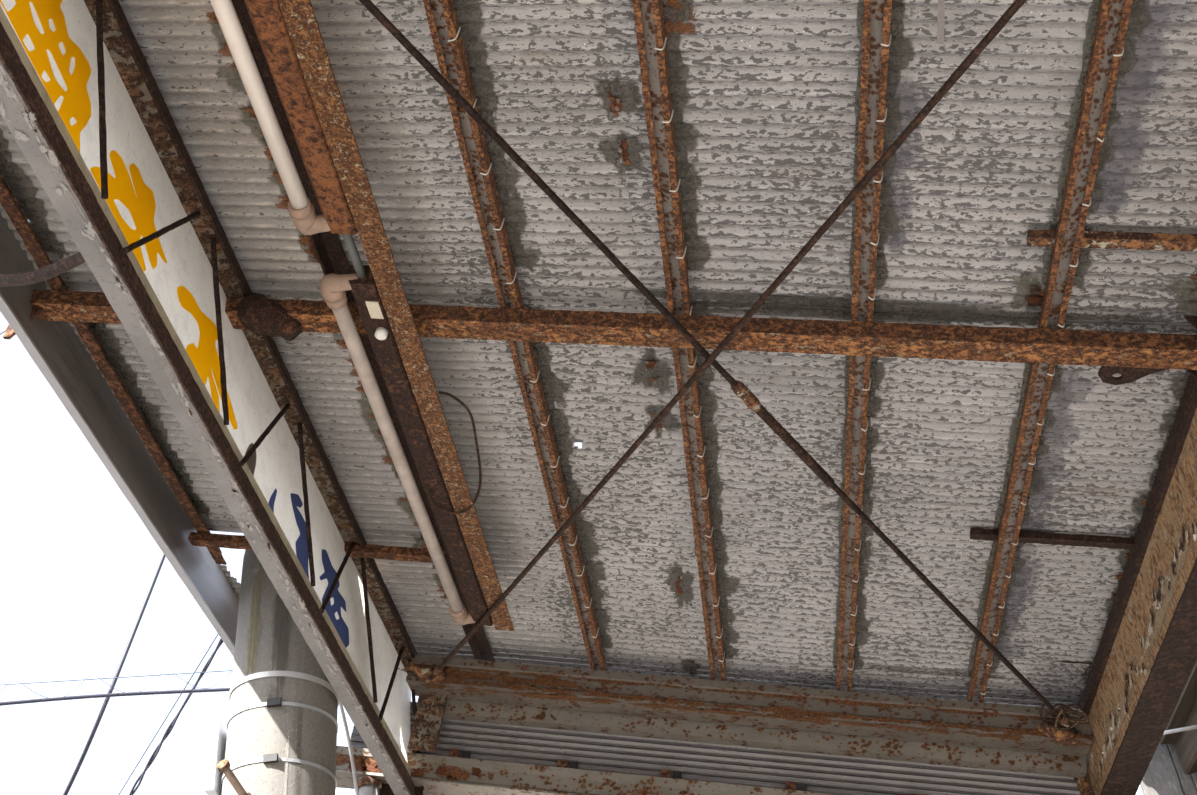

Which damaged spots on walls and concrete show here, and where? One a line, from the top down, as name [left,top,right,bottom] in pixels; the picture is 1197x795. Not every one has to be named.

corrosion [218,43,237,69]
corrosion [243,92,290,212]
corrosion [298,235,319,263]
corrosion [337,340,365,393]
corrosion [368,408,427,549]
peeling [1090,520,1197,784]
corrosion [398,660,1095,746]
corrosion [411,763,493,780]